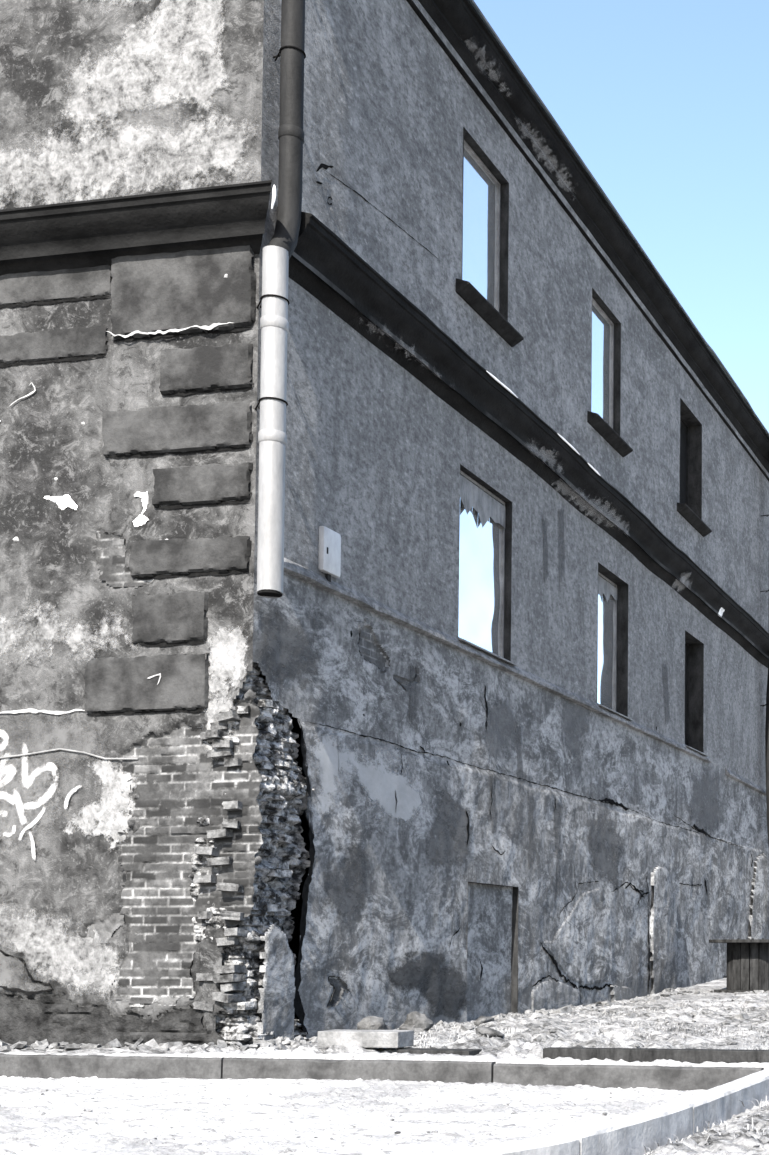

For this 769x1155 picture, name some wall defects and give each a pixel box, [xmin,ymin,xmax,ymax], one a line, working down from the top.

spalling [44,495,78,510]
spalling [133,491,149,527]
spalling [350,617,420,691]
spalling [0,628,315,1047]
crack [294,721,753,1034]
leakage [388,951,467,1020]